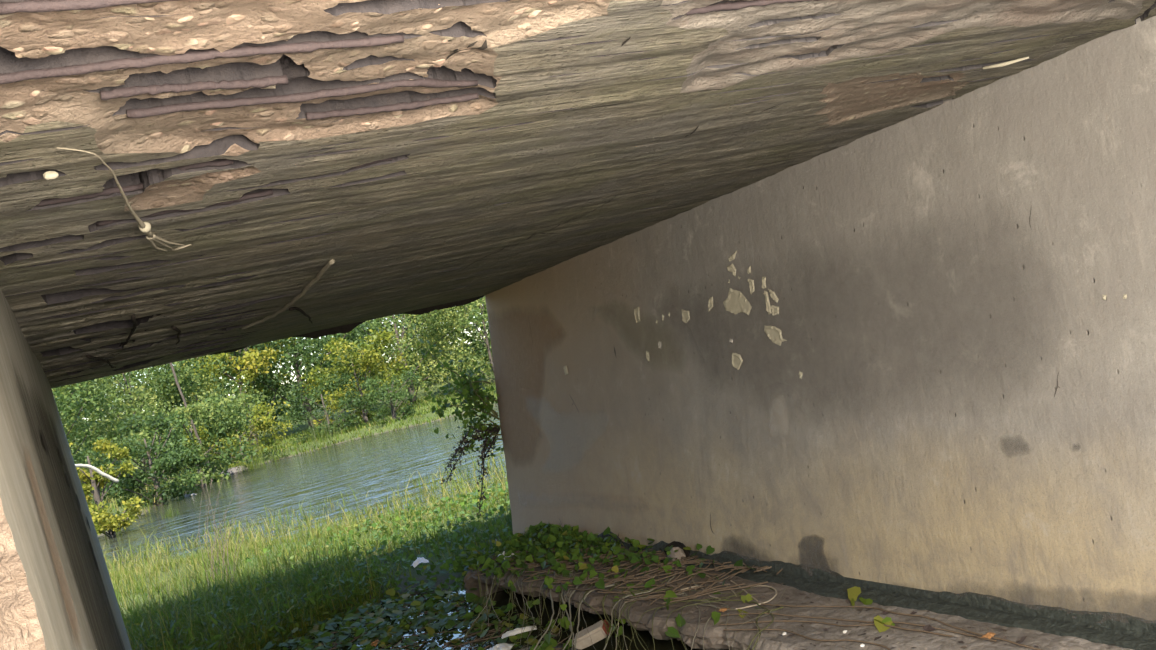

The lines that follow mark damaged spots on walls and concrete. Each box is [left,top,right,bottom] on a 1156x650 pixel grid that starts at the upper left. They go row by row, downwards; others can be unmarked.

spalling [641,0,1156,131]
spalling [0,0,663,382]
peeling [656,309,690,323]
peeling [729,339,743,370]
peeling [708,250,787,346]